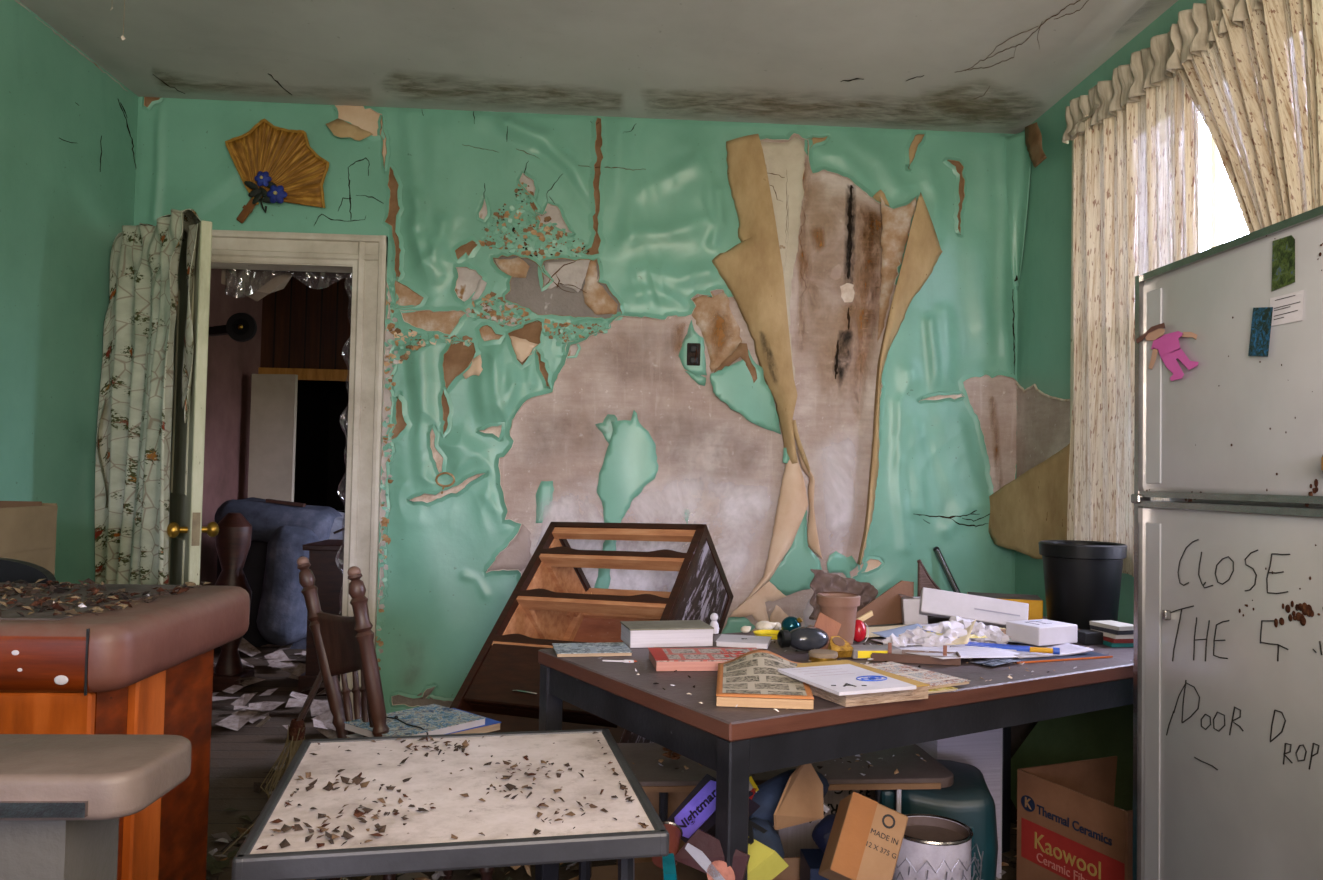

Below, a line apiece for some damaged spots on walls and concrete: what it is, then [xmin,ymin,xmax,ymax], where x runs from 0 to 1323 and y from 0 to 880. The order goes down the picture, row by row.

crack [958,0,1087,99]
peeling [1025,122,1047,168]
crack [314,157,384,225]
damp [846,187,855,277]
flaking render [947,160,964,232]
peeling [326,105,942,670]
damp [835,331,852,379]
peeling [924,370,1070,559]
spalling [389,685,454,709]